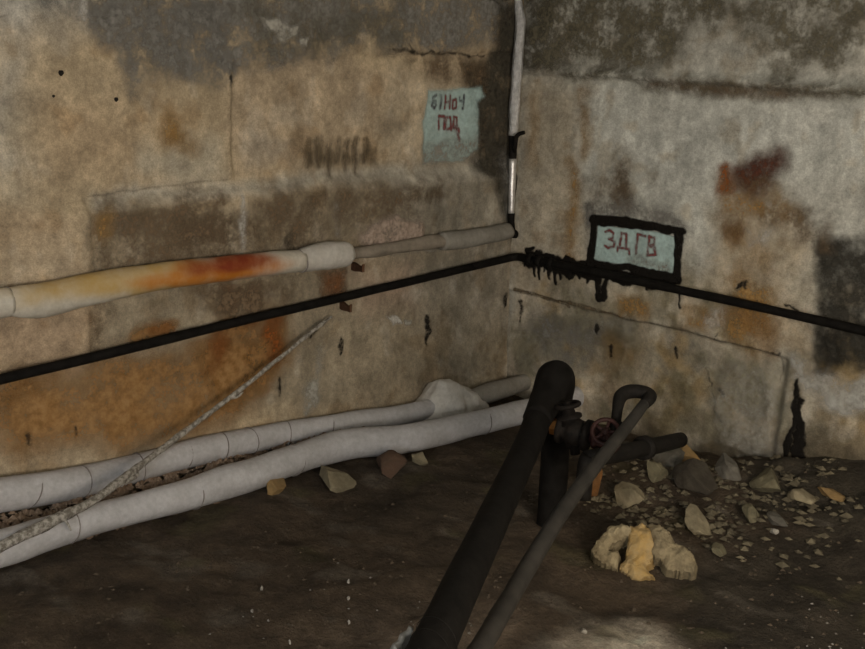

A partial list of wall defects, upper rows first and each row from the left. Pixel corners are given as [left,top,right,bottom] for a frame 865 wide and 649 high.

crack [393,48,484,57]
leakage [88,0,865,223]
rust [717,148,802,223]
rust [0,285,285,451]
leakage [792,227,865,414]